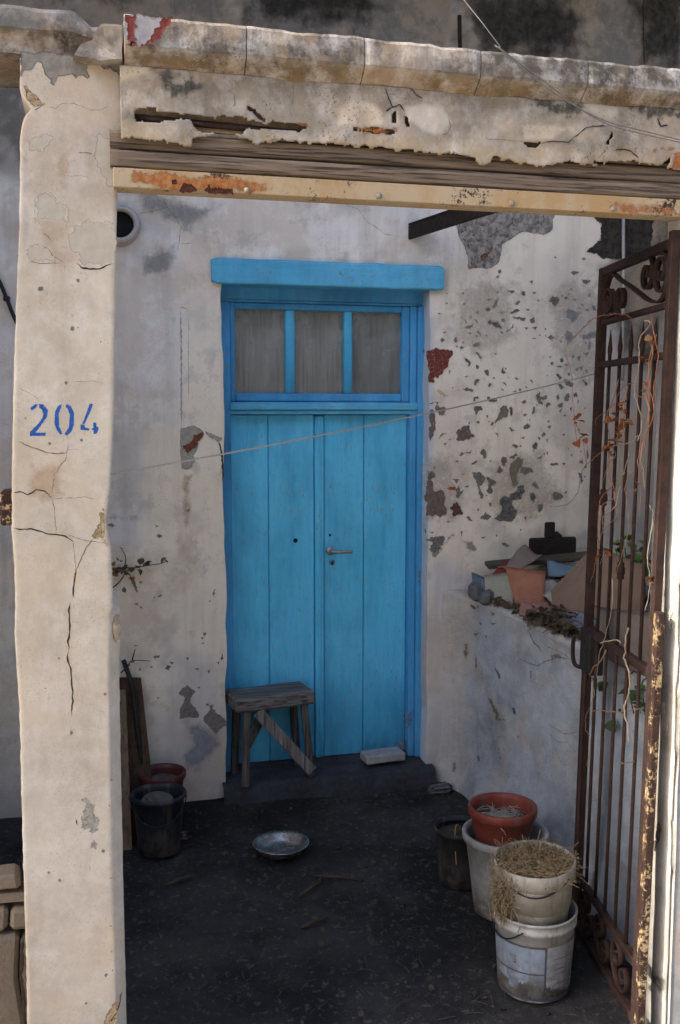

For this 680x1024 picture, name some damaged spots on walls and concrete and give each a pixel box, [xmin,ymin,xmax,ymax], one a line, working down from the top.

spalling [19,24,123,107]
crack [385,88,423,112]
peeling [94,134,117,186]
rust [131,170,266,195]
crack [486,125,638,158]
peeling [68,219,117,265]
peeling [423,212,654,531]
spalling [180,425,222,470]
peeling [424,529,445,553]
crack [14,441,104,713]
peeling [179,685,227,733]
spalling [81,797,105,852]